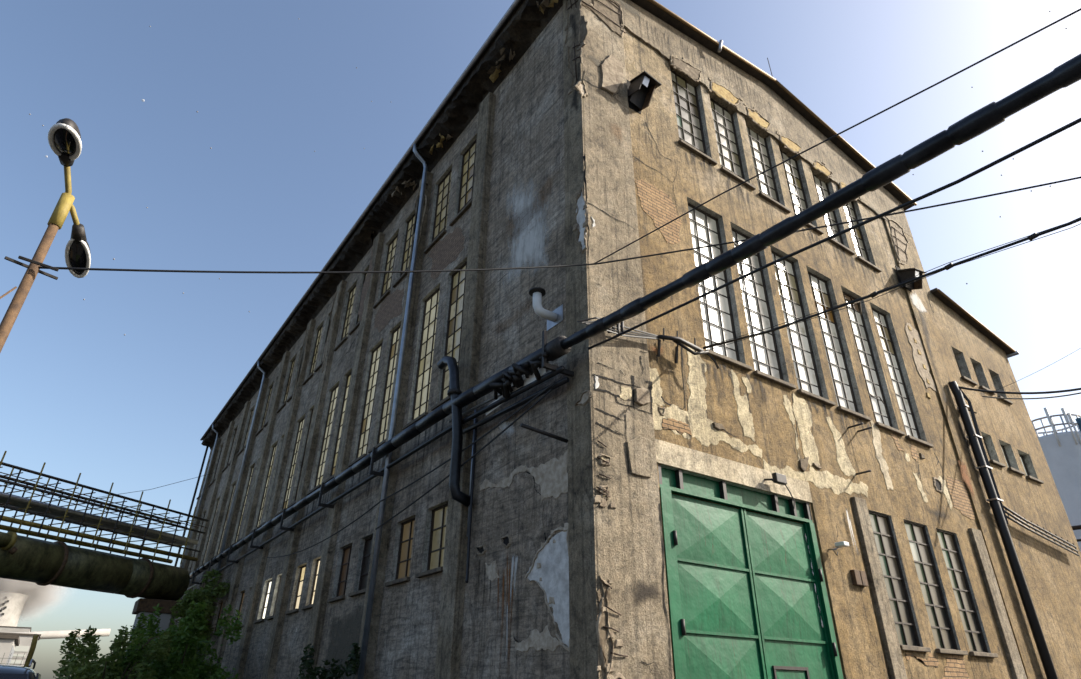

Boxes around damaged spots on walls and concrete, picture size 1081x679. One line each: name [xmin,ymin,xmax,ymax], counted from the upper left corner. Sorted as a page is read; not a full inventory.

peeling [619,386,632,400]
peeling [649,341,868,498]
peeling [513,523,570,652]
spalling [595,576,628,679]